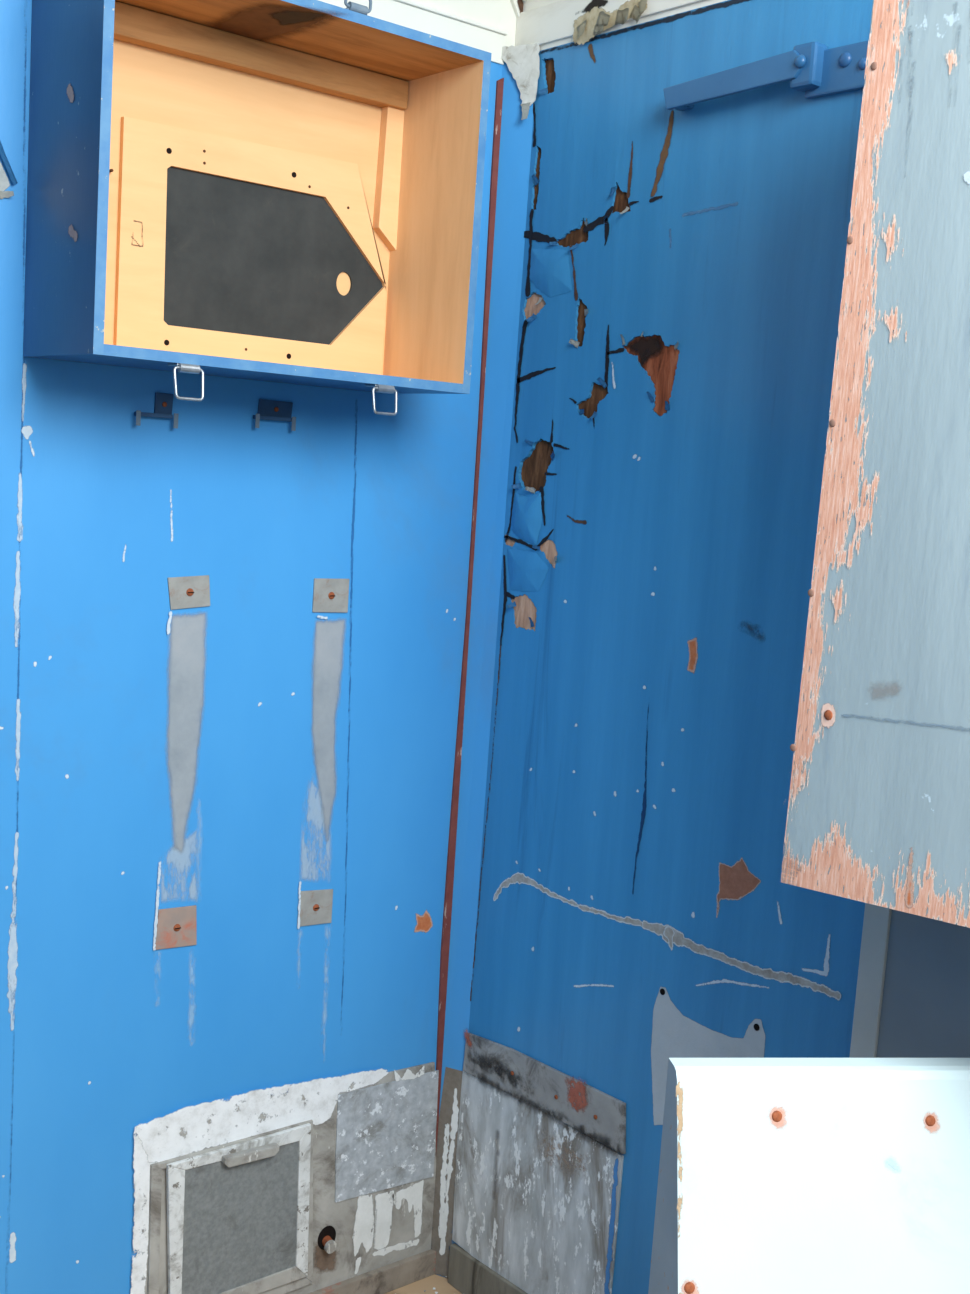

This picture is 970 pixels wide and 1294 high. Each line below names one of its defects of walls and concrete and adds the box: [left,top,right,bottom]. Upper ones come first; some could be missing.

crack [530,103,538,147]
crack [470,142,639,1001]
crack [632,707,649,894]
corrosion [414,910,433,933]
peeling [394,1066,425,1081]
peeling [604,1158,618,1294]